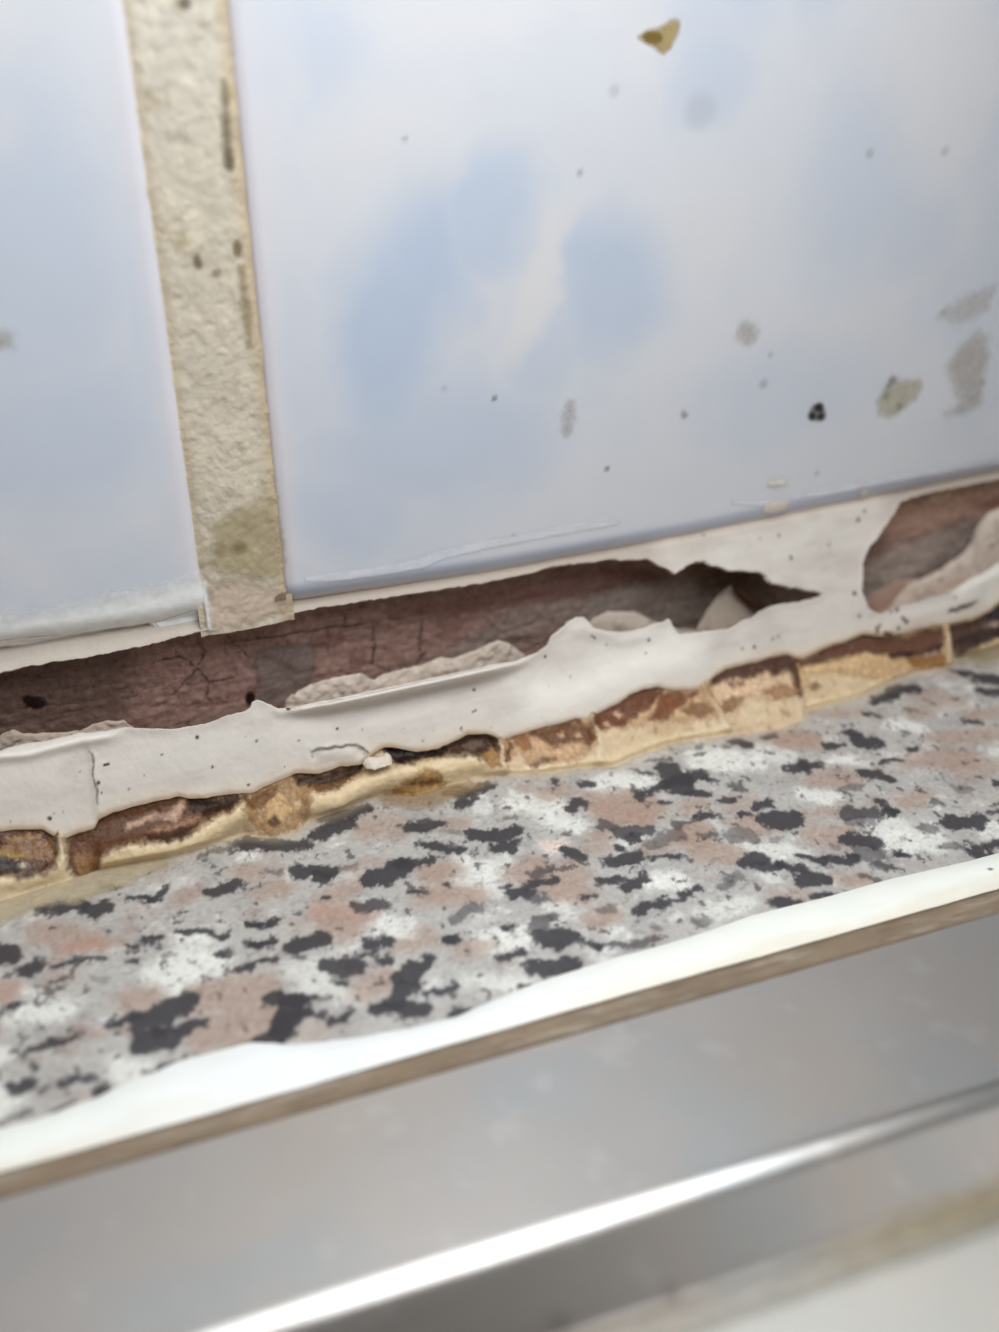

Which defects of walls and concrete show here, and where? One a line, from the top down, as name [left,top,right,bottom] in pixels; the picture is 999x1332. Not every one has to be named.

peeling [732,460,999,514]
peeling [305,519,619,581]
peeling [0,579,212,646]
spalling [23,696,46,709]
spalling [246,643,315,705]